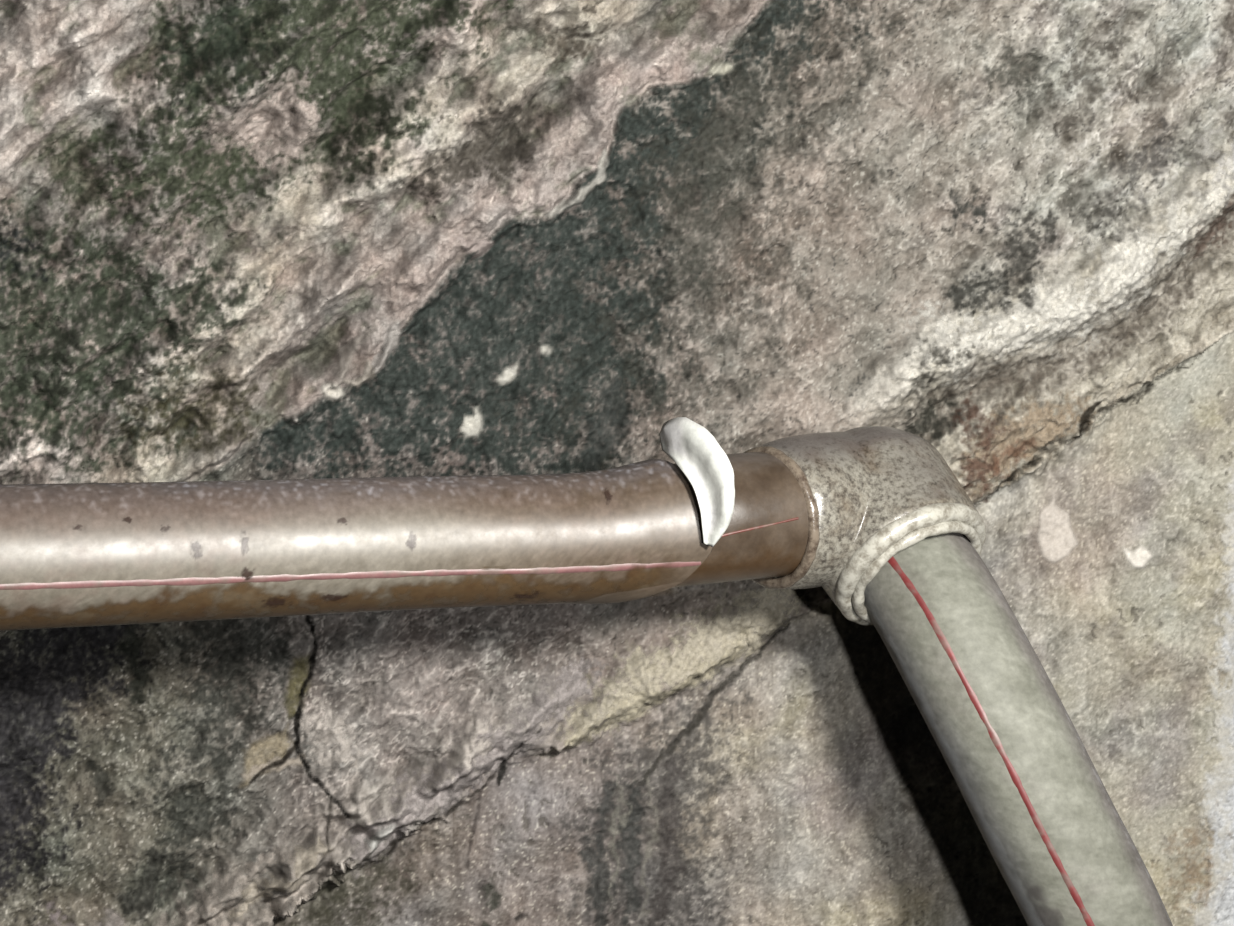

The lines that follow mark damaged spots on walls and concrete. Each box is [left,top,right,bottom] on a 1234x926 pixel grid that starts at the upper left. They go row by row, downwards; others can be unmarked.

crack [975,363,1193,504]
crack [250,615,350,843]